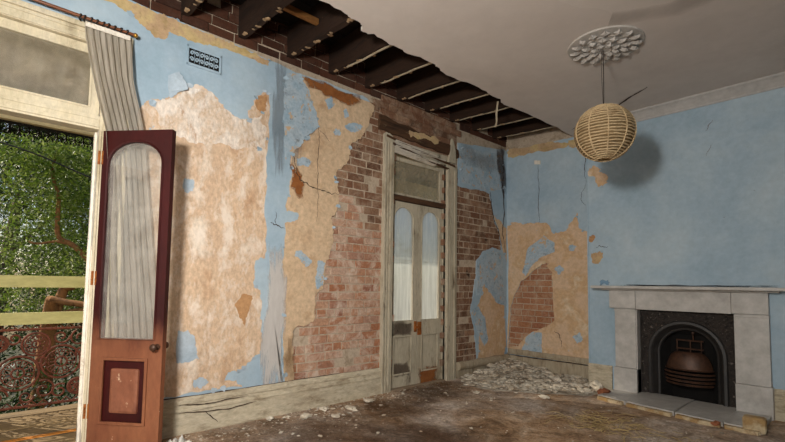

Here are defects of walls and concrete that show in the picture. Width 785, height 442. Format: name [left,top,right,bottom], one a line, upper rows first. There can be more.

flaking render [105,0,603,397]